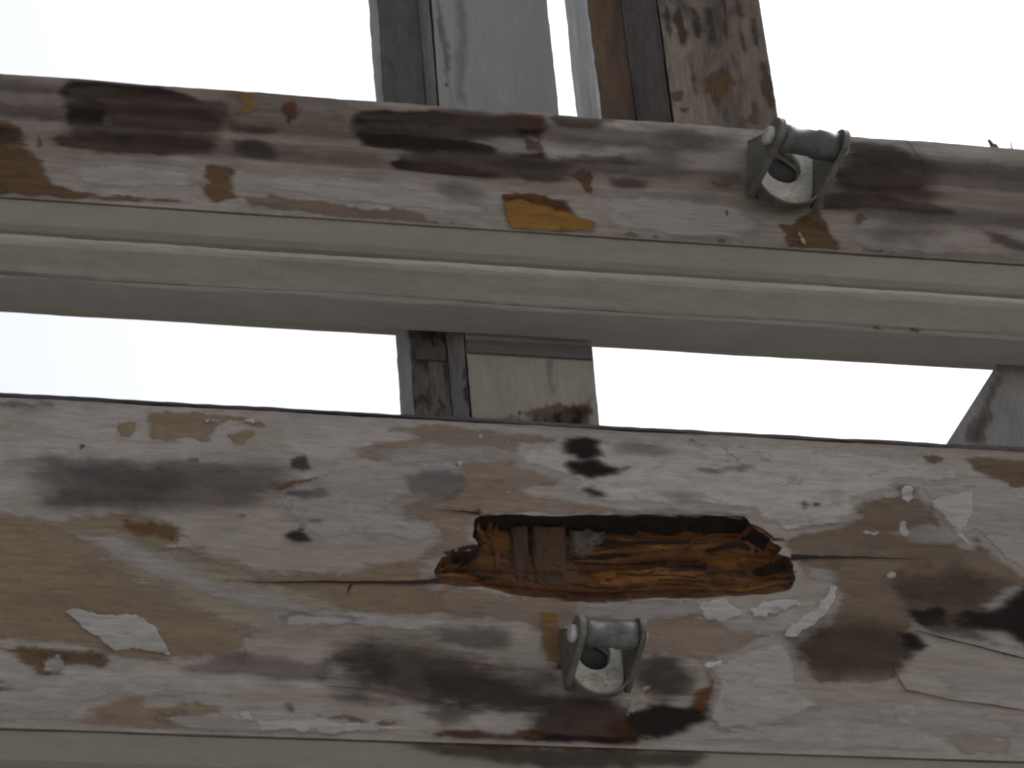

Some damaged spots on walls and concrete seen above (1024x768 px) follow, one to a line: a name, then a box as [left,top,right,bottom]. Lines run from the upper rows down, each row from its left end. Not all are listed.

peeling [0,120,180,202]
leakage [54,80,276,158]
peeling [204,165,438,224]
leakage [353,110,633,181]
peeling [779,208,839,249]
peeling [148,412,264,444]
leakage [35,444,276,506]
leakage [564,437,630,495]
crack [244,578,439,593]
peeling [0,422,1024,682]
leakage [797,588,1024,670]
leakage [185,629,722,768]